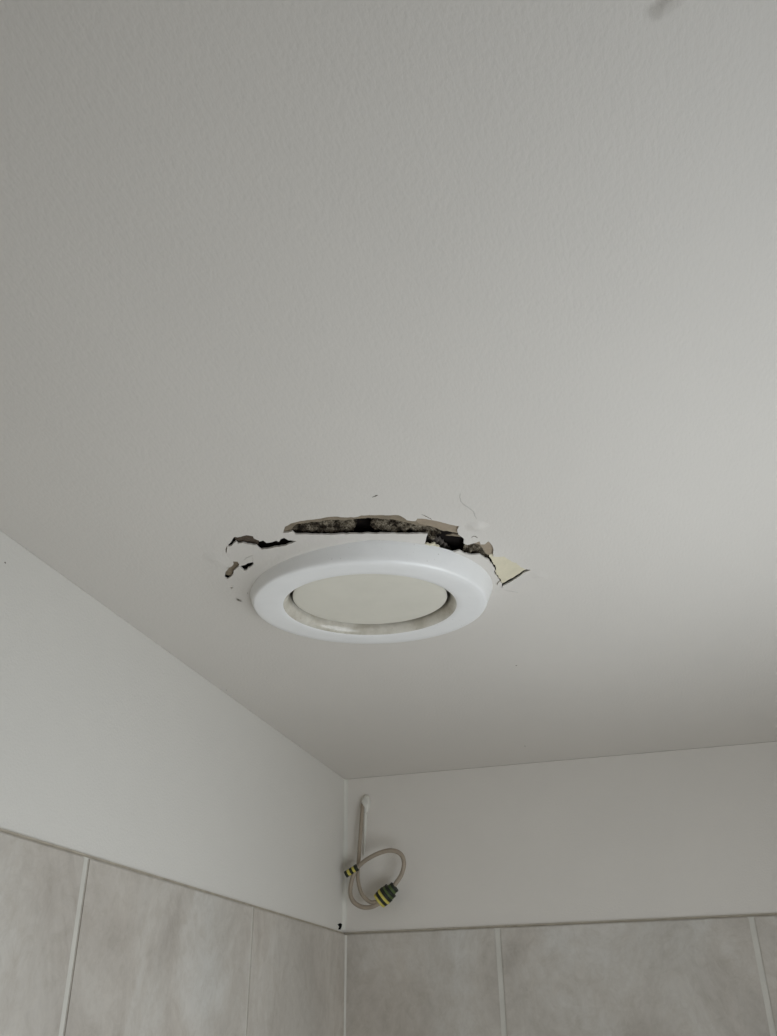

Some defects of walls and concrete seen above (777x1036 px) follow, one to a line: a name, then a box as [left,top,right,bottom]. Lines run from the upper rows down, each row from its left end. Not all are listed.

spalling [283,514,527,593]